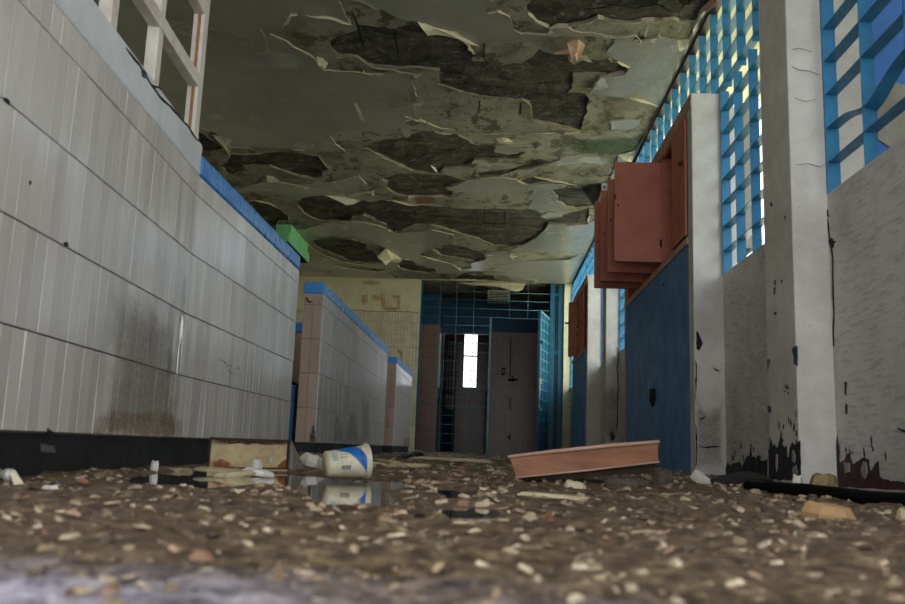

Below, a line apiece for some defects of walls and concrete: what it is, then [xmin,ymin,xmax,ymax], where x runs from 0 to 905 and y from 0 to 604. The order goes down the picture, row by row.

crack [126,48,198,141]
peeling [198,0,718,292]
crack [827,218,837,347]
peeling [726,411,801,481]
peeling [836,436,905,490]